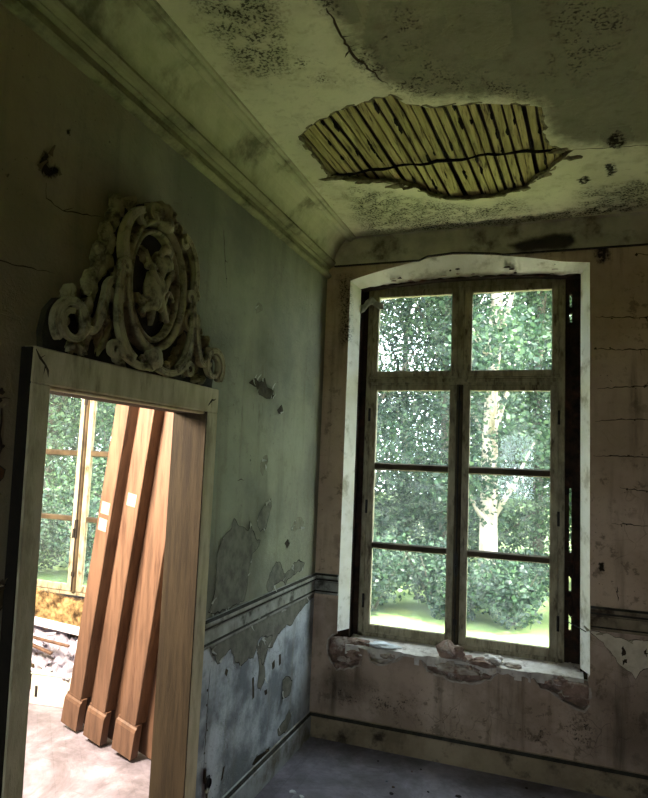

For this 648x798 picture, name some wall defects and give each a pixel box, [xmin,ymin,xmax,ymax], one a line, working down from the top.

leakage [202,0,284,76]
leakage [316,0,648,149]
spalling [298,94,482,181]
leakage [353,176,648,232]
leakage [509,234,575,252]
peeling [249,375,276,399]
crack [0,388,10,453]
peeling [266,559,305,592]
peeling [210,594,314,700]
spalling [326,631,403,671]
peeling [584,626,648,679]
spalling [533,676,592,713]